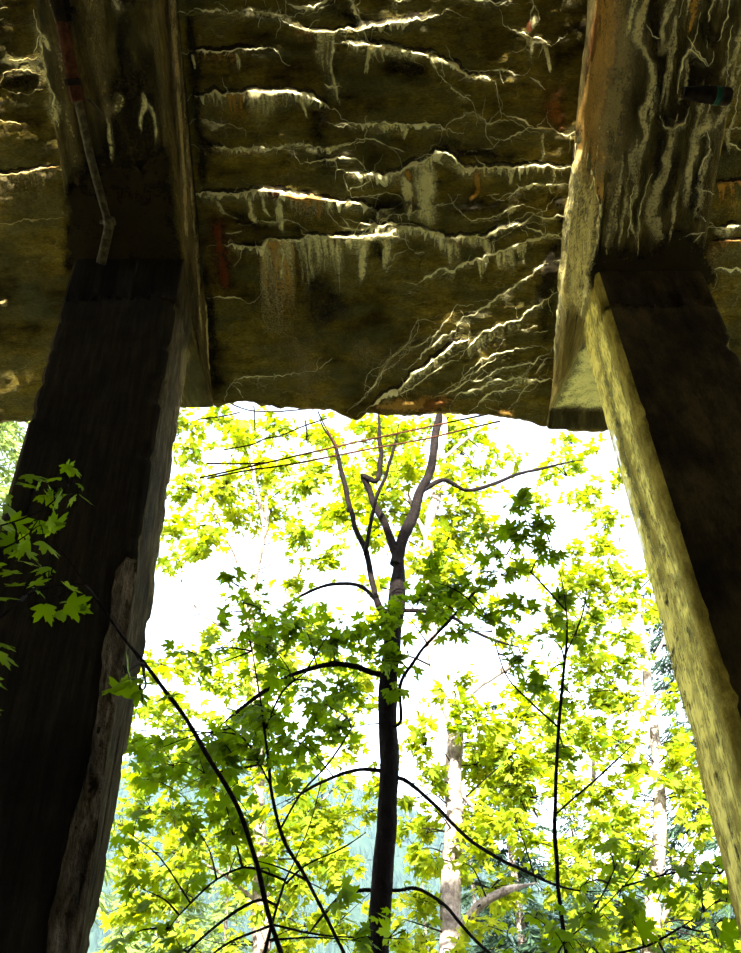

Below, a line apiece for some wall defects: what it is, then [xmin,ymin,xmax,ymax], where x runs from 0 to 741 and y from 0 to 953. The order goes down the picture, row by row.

damp [372,240,389,262]
crack [182,0,582,425]
damp [372,197,422,216]
damp [538,0,741,924]